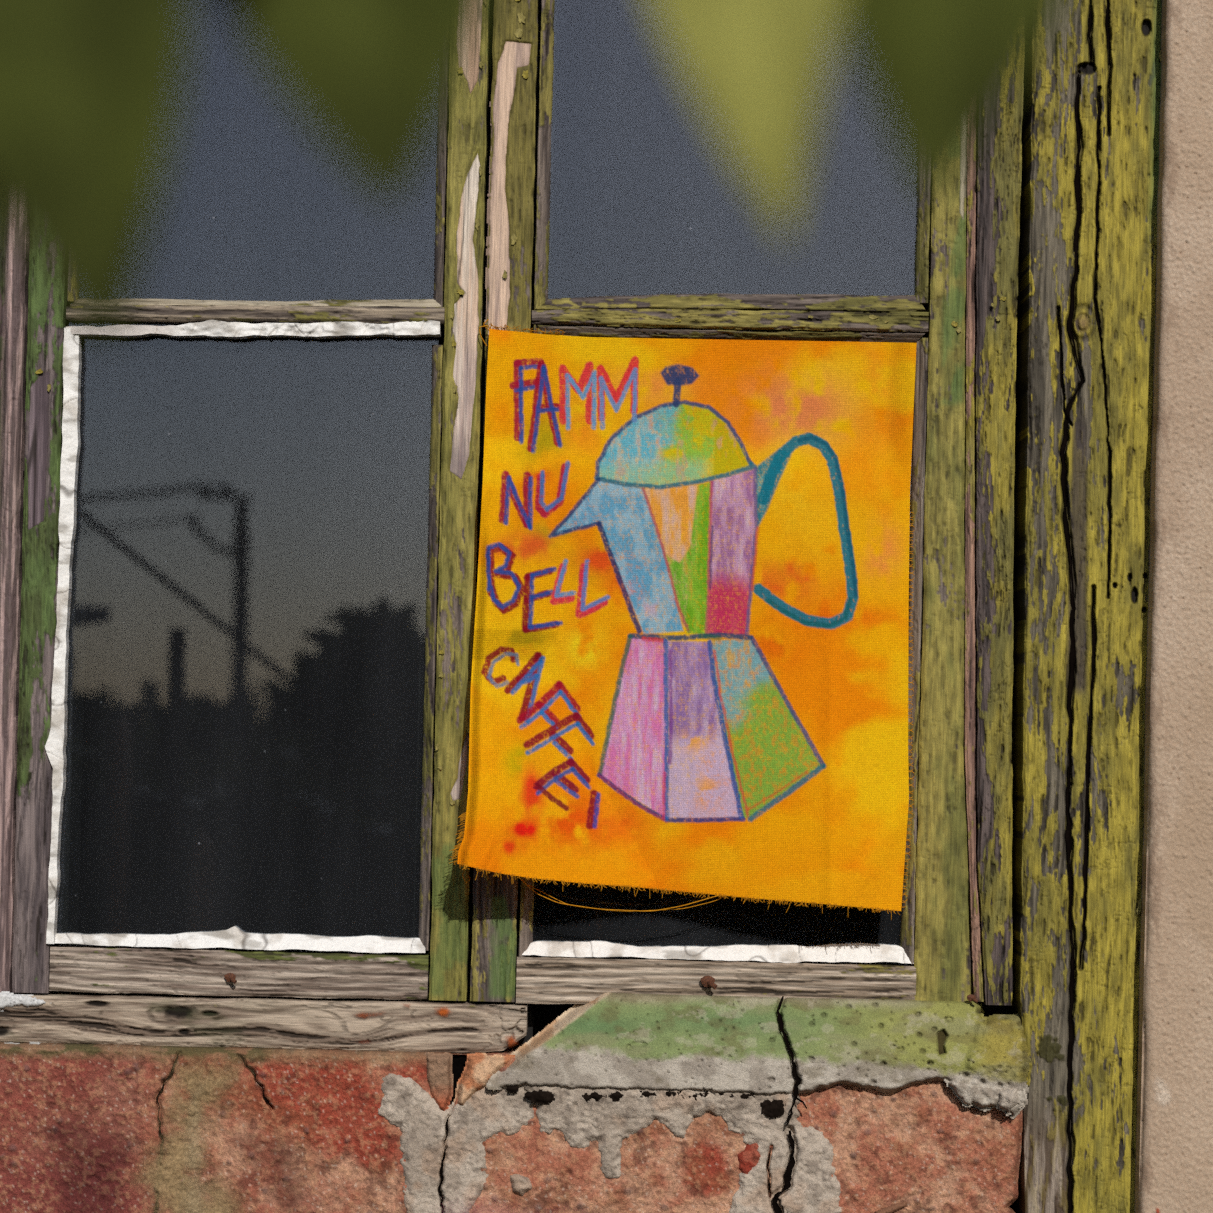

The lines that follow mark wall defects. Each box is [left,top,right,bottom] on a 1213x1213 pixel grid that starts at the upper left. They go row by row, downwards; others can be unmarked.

peeling [959,157,967,220]
peeling [450,0,531,479]
crack [1058,0,1111,1213]
spalling [423,1052,515,1111]
spalling [506,1085,555,1104]
spalling [582,1089,623,1103]
spalling [640,1091,786,1119]
crack [767,996,807,1213]
spalling [944,1078,1028,1119]
crack [438,1116,450,1213]
spalling [737,1143,761,1174]